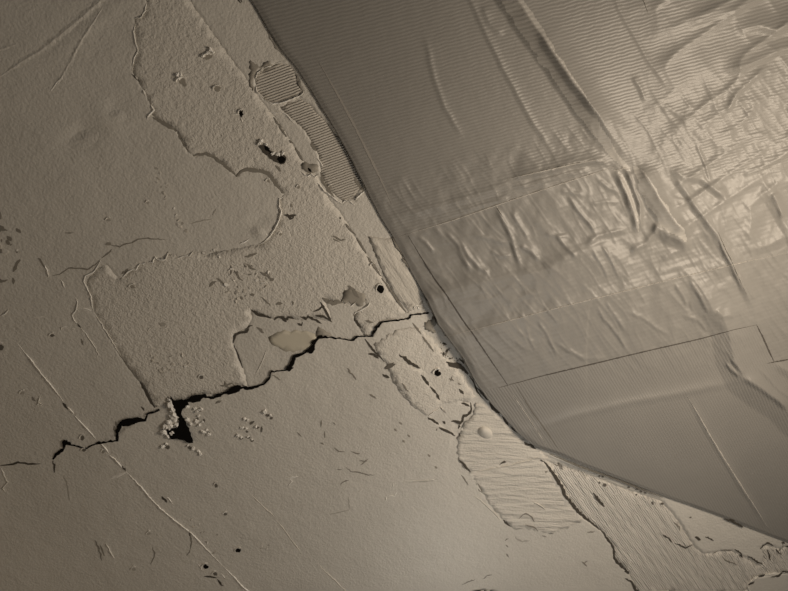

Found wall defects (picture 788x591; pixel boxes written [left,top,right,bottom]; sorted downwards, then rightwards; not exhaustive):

peeling [72,0,475,449]
crack [0,361,160,500]
crack [184,253,638,591]
spalling [545,463,788,591]